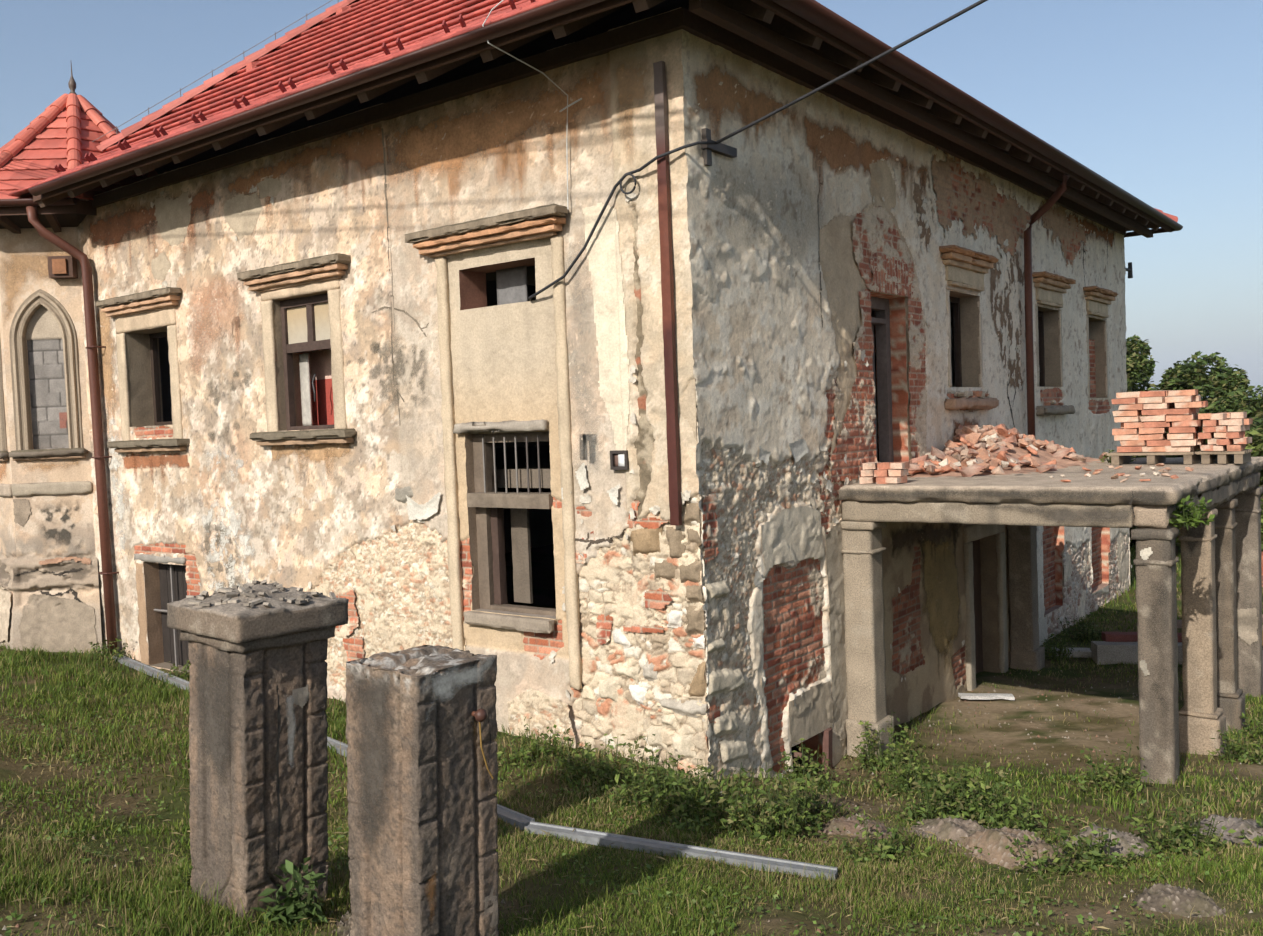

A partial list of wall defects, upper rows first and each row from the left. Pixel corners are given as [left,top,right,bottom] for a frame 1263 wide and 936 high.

flaking render [1088,398,1111,416]
flaking render [523,146,1087,780]
flaking render [13,499,31,527]
flaking render [39,556,91,565]
flaking render [134,486,473,692]